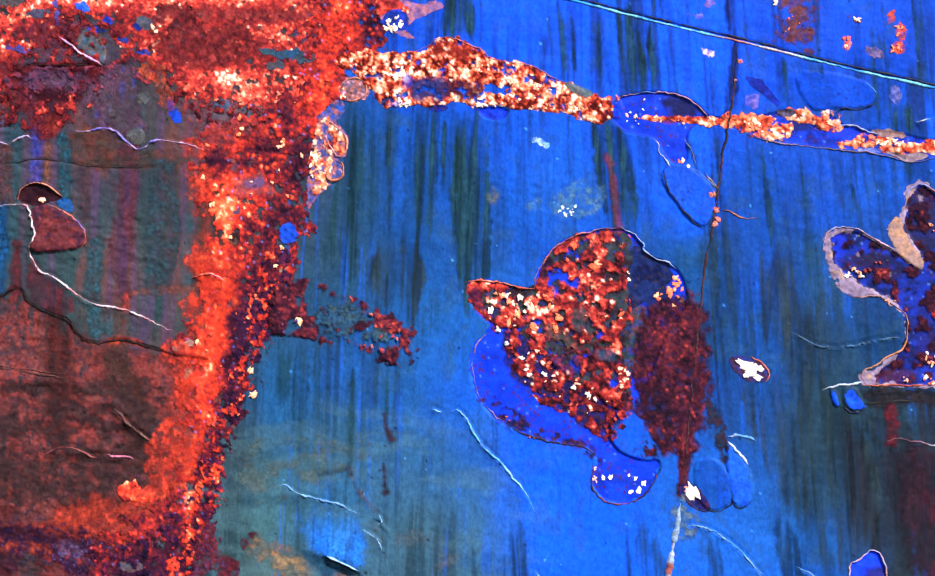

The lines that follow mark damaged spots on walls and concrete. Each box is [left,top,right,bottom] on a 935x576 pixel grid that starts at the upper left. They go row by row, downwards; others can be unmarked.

crack [0,127,203,168]
peeling [613,91,716,229]
corrosion [692,107,935,163]
crack [2,204,173,331]
corrosion [0,0,620,576]
crack [432,409,535,511]
peeling [466,226,687,505]
corrosion [616,290,729,497]
crack [665,44,763,576]
peeling [679,433,755,513]
peeling [729,355,770,382]
peeling [822,179,935,414]